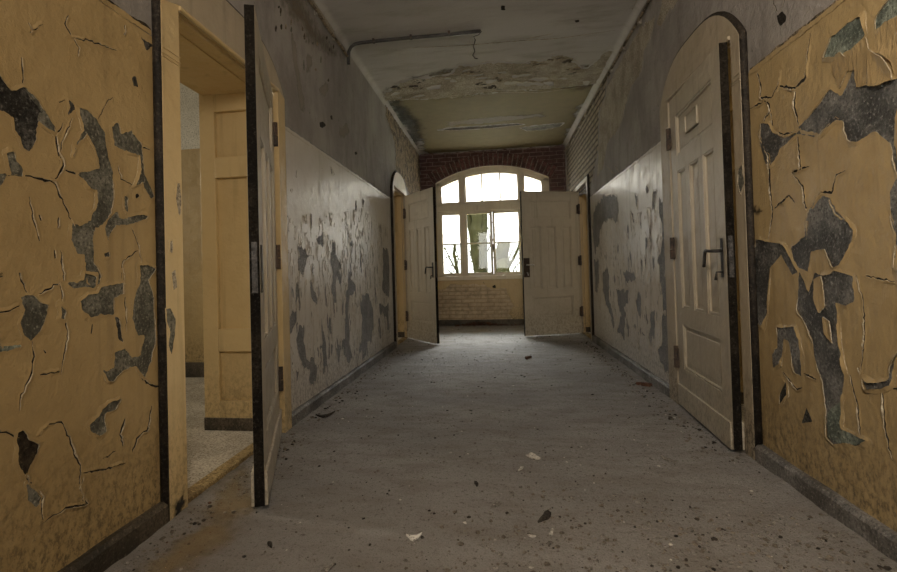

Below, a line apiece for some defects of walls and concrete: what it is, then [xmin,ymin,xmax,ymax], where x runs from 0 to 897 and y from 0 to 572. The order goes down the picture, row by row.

crack [27,14,127,58]
crack [0,95,158,528]
peeling [0,66,177,384]
peeling [287,199,392,391]
flaking render [438,283,515,320]
peeling [391,57,583,99]
flaking render [385,68,612,202]
peeling [592,184,669,375]
peeling [755,191,897,449]
peeling [759,0,897,294]
peeling [13,427,43,509]
peeling [86,396,122,440]